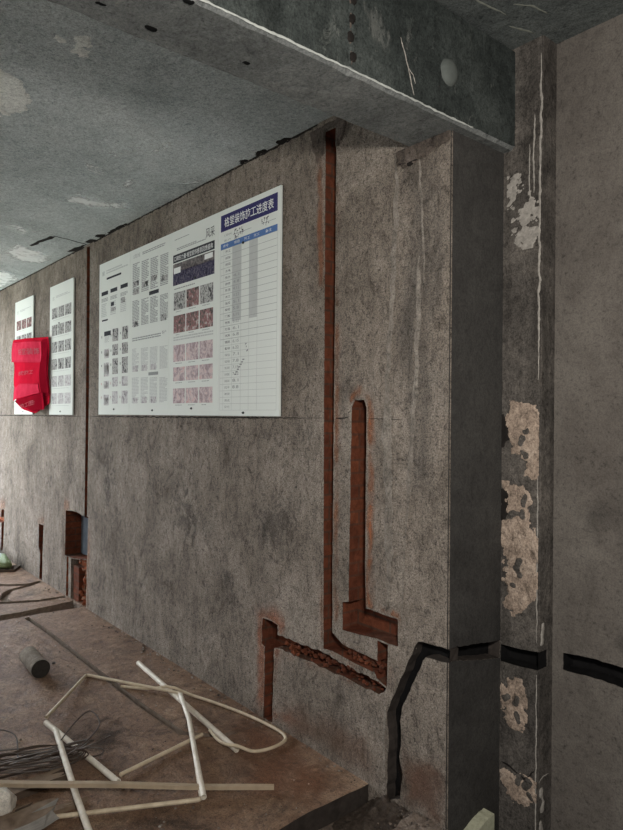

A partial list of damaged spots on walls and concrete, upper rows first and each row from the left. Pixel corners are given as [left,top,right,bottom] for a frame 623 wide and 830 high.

peeling [507,173,539,250]
peeling [501,400,539,617]
peeling [500,677,528,733]
crack [502,761,549,782]